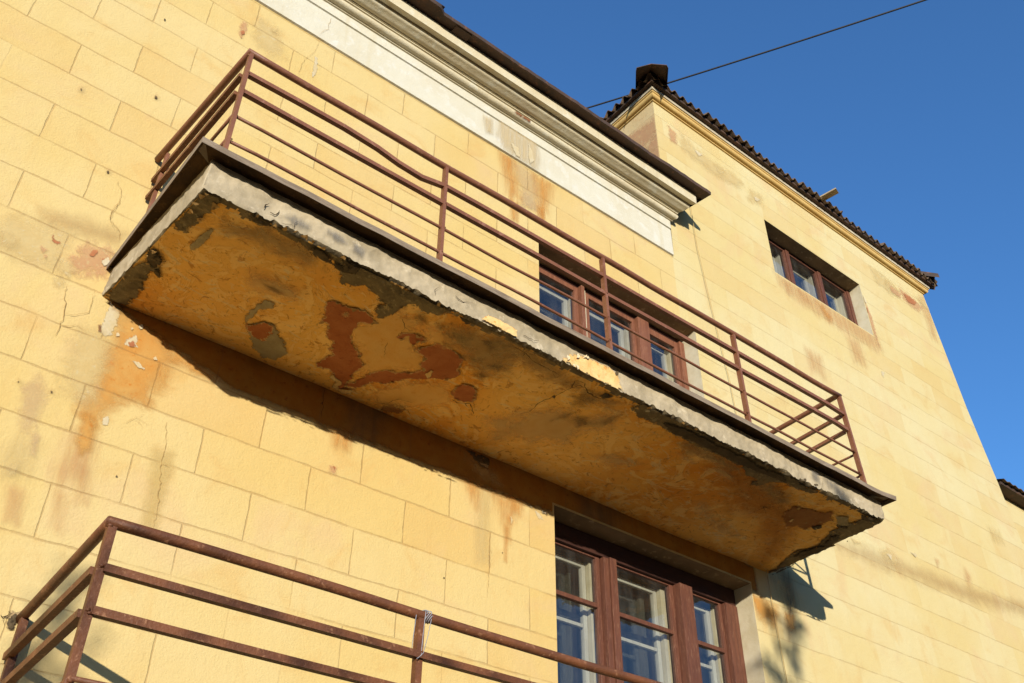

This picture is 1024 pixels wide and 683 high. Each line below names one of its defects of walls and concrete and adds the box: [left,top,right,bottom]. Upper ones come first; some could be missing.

water stain [190,229,213,251]
spalling [98,248,166,348]
water stain [245,278,296,323]
peeling [245,214,518,403]
peeling [563,353,623,398]
water stain [71,305,795,629]
spalling [769,506,881,575]